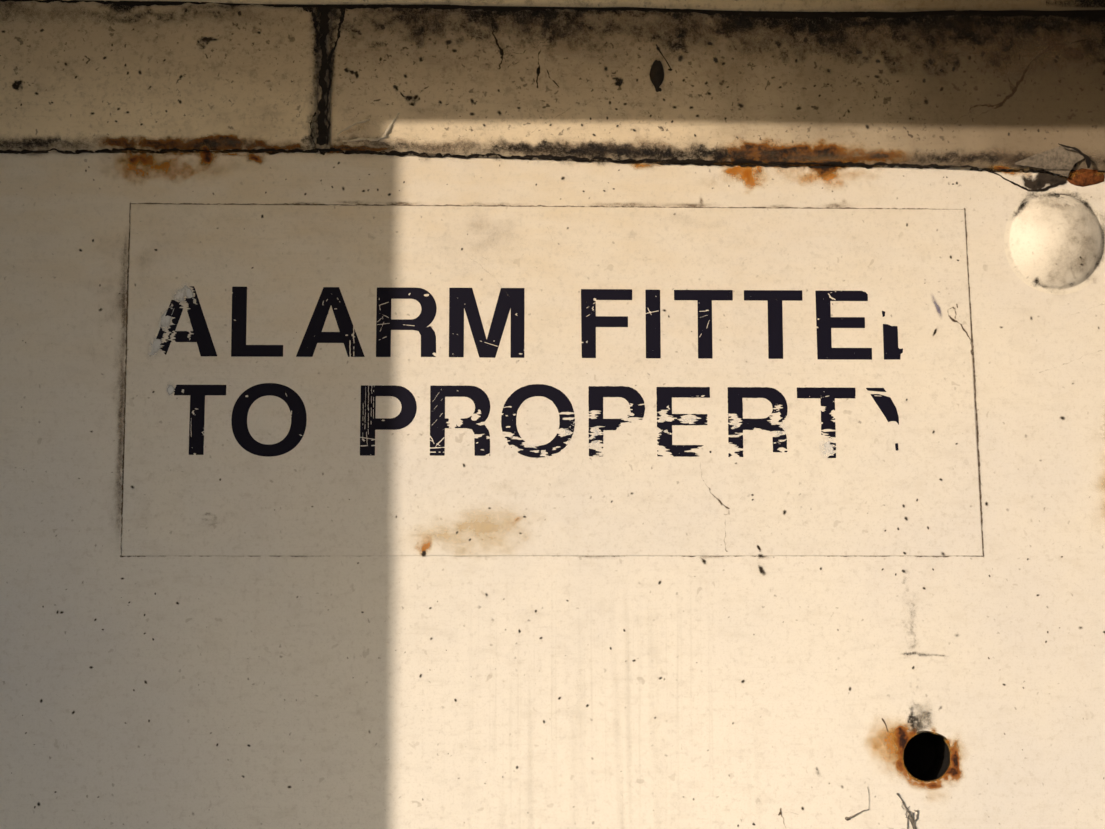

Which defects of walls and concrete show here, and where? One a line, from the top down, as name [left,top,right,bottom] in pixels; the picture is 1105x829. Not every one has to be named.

water stain [394,75,427,106]
corrosion [102,134,303,178]
corrosion [713,139,906,188]
peeling [970,143,1091,192]
corrosion [875,718,962,789]